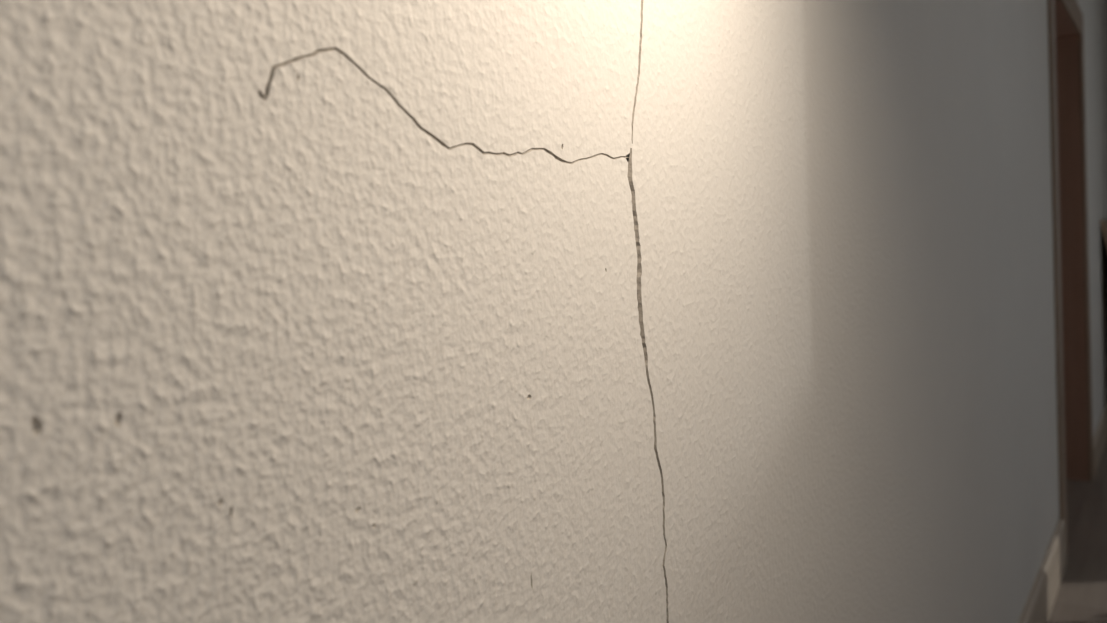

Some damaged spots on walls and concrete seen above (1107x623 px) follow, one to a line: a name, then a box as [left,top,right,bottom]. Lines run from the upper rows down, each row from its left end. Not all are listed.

crack [258,0,669,623]